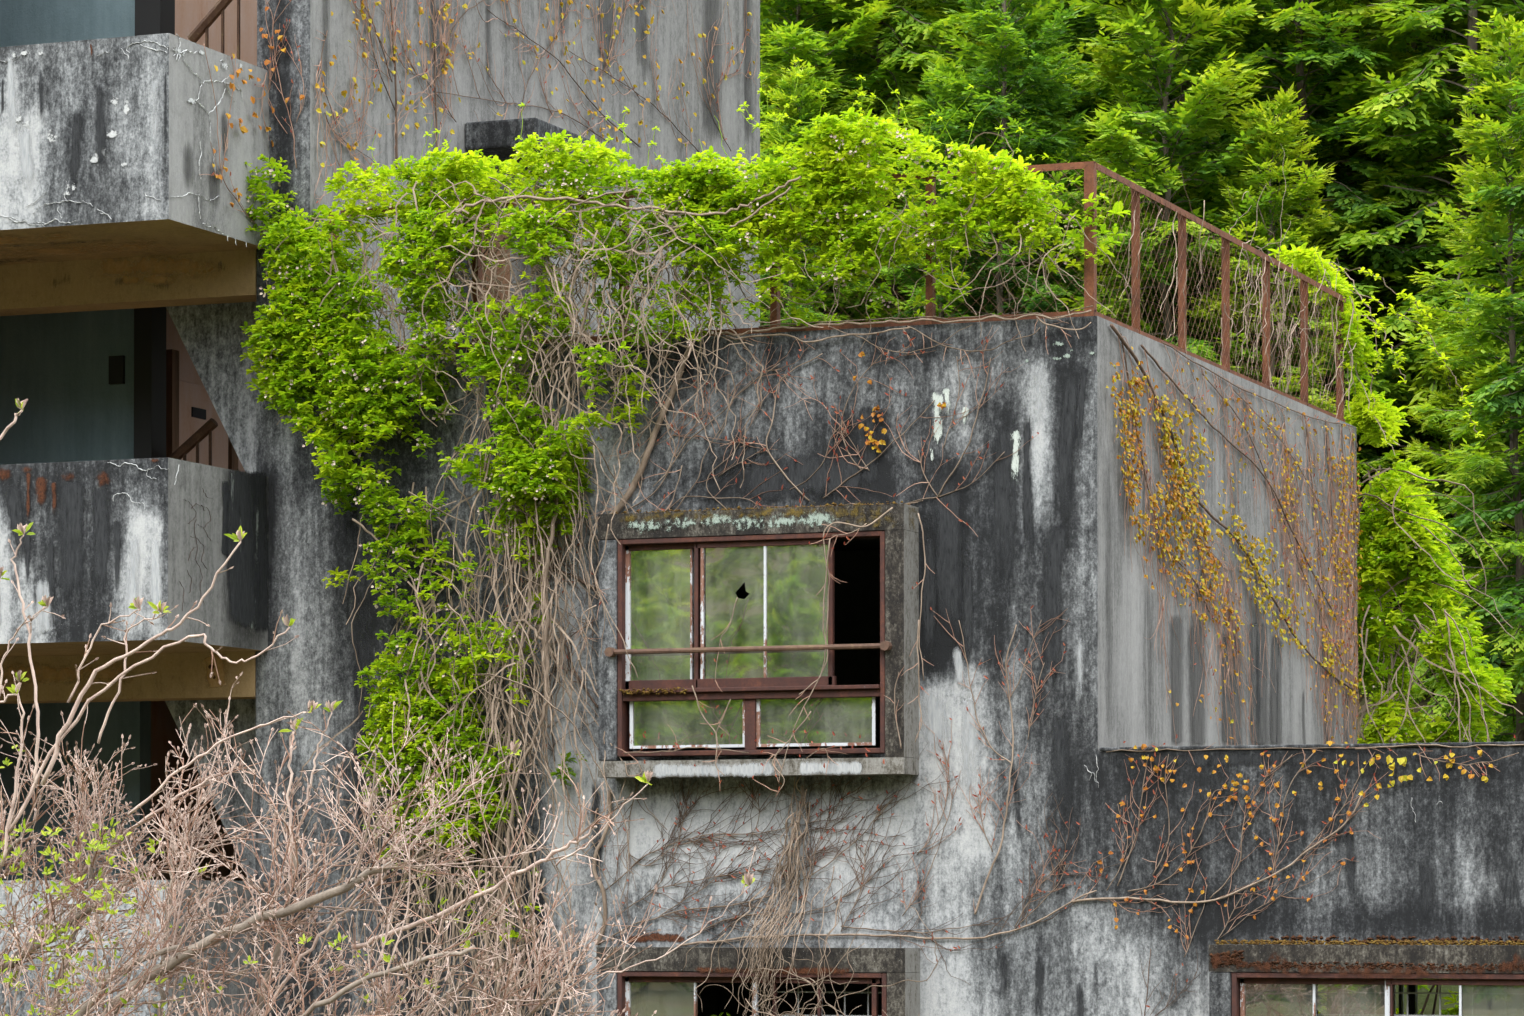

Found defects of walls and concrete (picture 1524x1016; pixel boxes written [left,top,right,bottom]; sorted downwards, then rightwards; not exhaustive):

damp [70,87,106,187]
damp [707,407,879,503]
damp [2,482,162,631]
damp [222,469,274,631]
damp [922,388,980,787]
damp [991,366,1087,691]
damp [654,762,774,777]
damp [800,761,862,774]
damp [1011,765,1021,836]
damp [1111,617,1429,794]
damp [284,870,318,1016]
damp [1035,959,1044,1015]